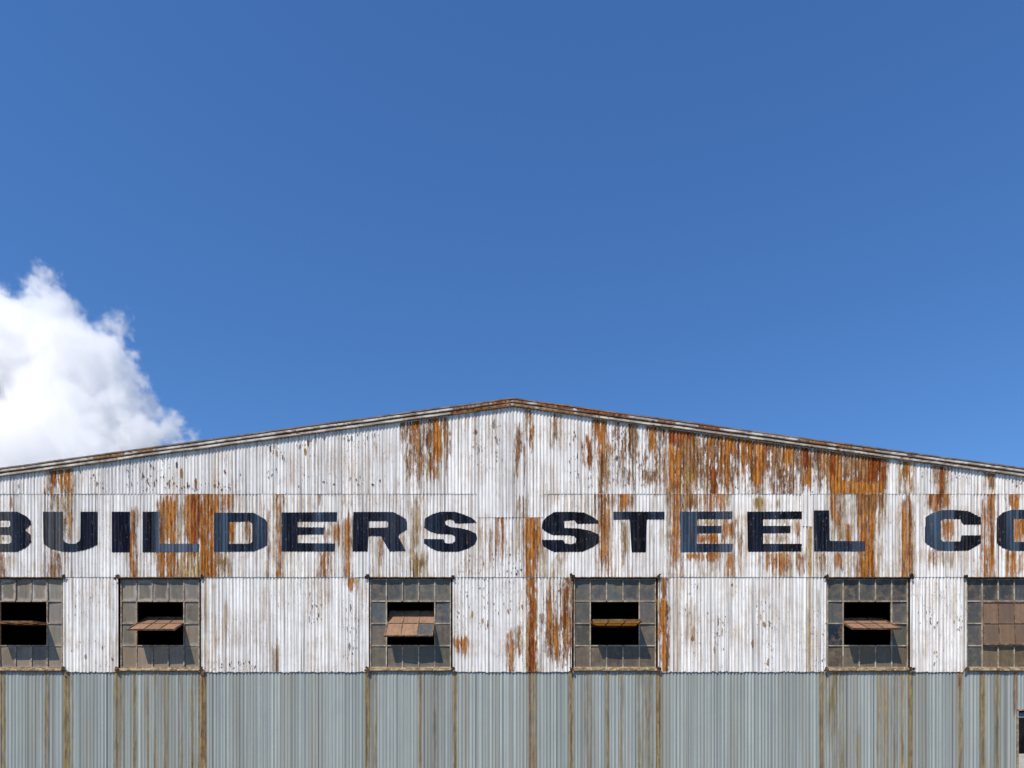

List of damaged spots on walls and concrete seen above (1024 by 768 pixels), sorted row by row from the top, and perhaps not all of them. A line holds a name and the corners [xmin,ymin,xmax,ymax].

rust [44,550,61,577]
rust [44,468,75,540]
rust [156,494,253,577]
rust [312,516,359,591]
rust [400,400,915,671]
rust [927,465,953,542]
rust [978,472,1024,577]